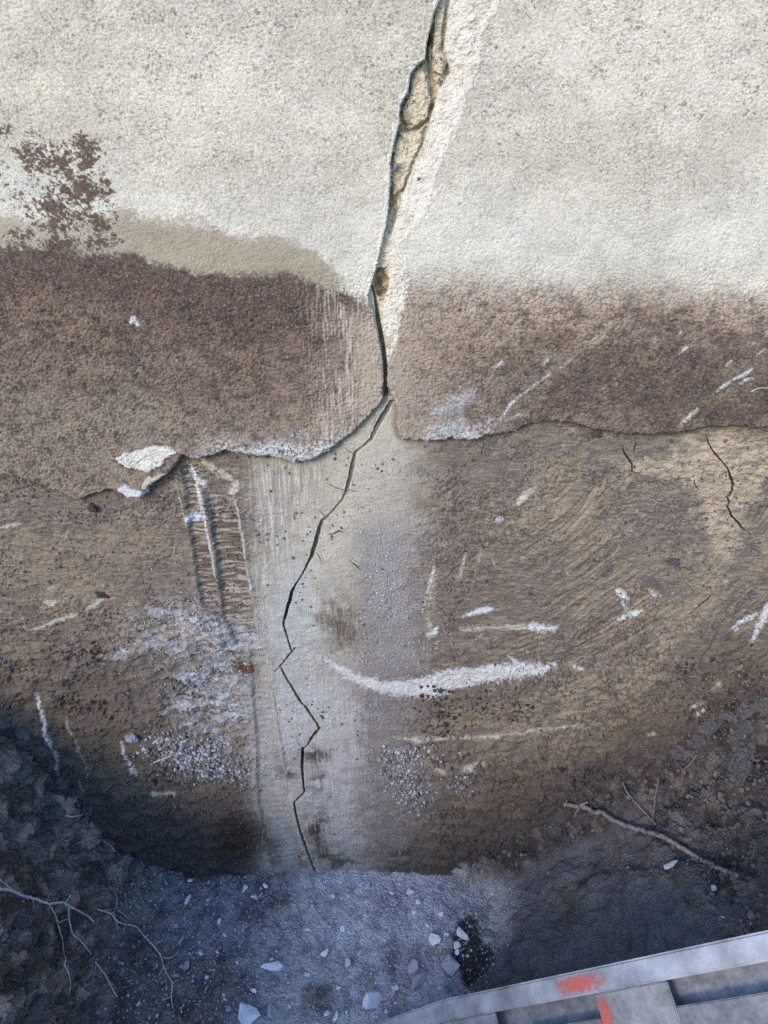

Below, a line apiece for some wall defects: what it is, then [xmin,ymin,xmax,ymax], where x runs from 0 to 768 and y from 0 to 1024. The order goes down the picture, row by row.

leakage [0,124,336,288]
peeling [115,445,233,498]
peeling [246,430,316,461]
crack [272,0,501,872]
leakage [430,389,477,432]
leakage [500,358,549,422]
crack [691,434,748,534]